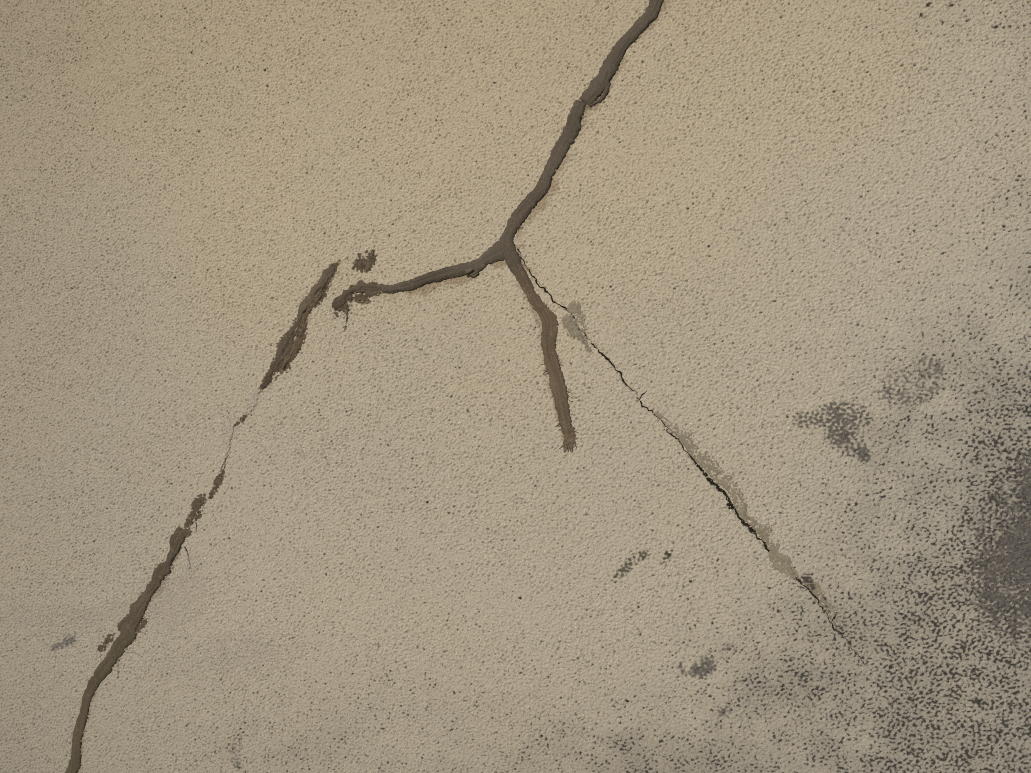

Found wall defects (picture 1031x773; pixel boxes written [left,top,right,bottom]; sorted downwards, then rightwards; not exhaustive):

crack [65,0,864,773]
damp [788,402,872,462]
damp [966,448,1031,647]